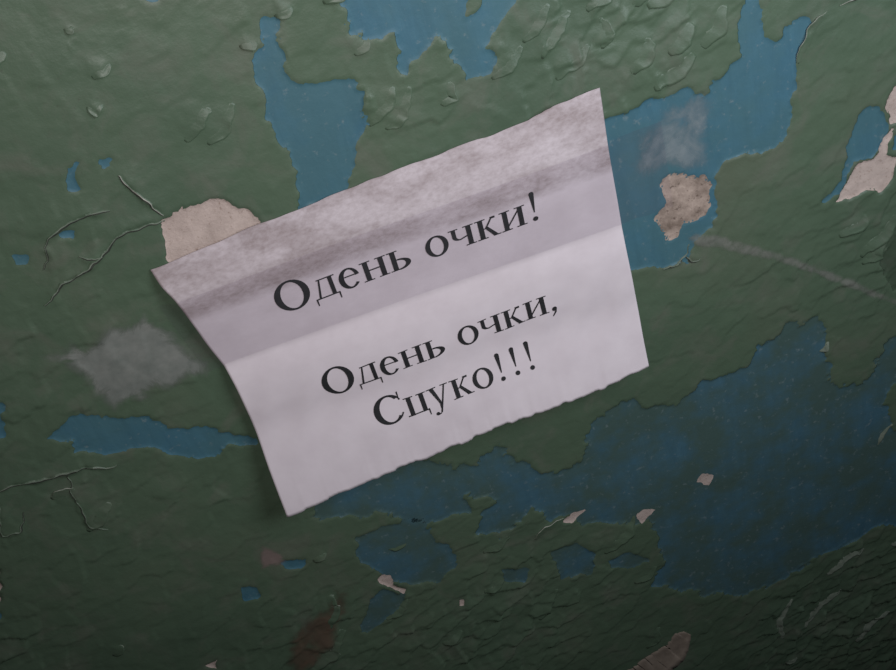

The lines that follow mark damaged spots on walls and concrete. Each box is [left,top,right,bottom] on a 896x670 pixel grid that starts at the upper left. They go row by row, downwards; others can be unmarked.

peeling [322,0,571,80]
peeling [239,6,370,209]
peeling [604,0,812,271]
peeling [822,86,896,203]
crack [43,175,165,306]
flaking render [161,198,260,263]
leakage [61,323,202,404]
peeling [47,414,258,459]
peeling [313,316,896,597]
peeling [628,631,691,670]